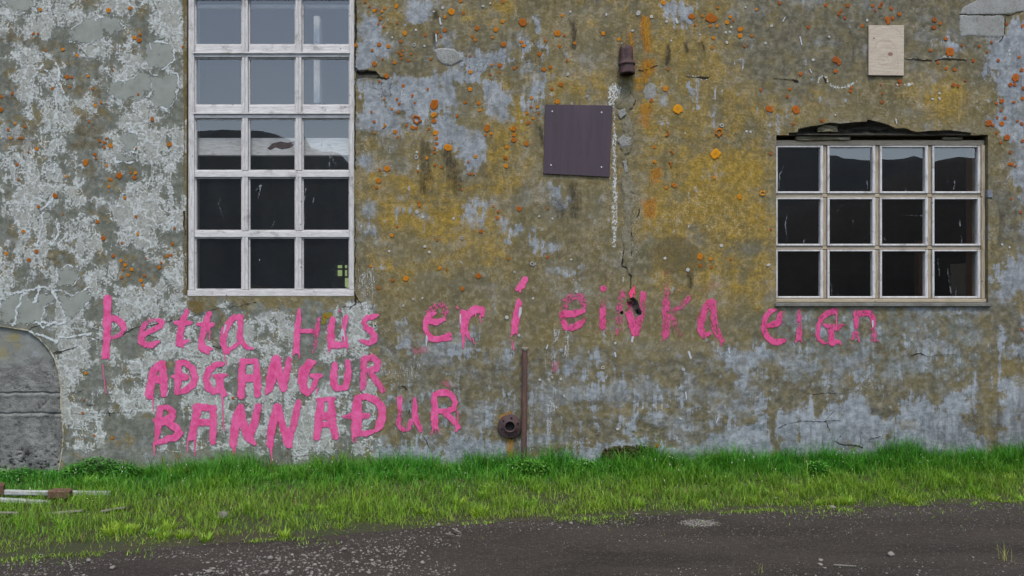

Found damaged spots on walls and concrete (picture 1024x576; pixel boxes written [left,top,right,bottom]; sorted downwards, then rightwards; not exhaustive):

flaking render [959,0,1024,37]
peeling [29,62,70,105]
peeling [145,40,179,112]
peeling [111,128,139,164]
leakage [608,83,622,258]
peeling [34,196,60,247]
crack [621,209,641,312]